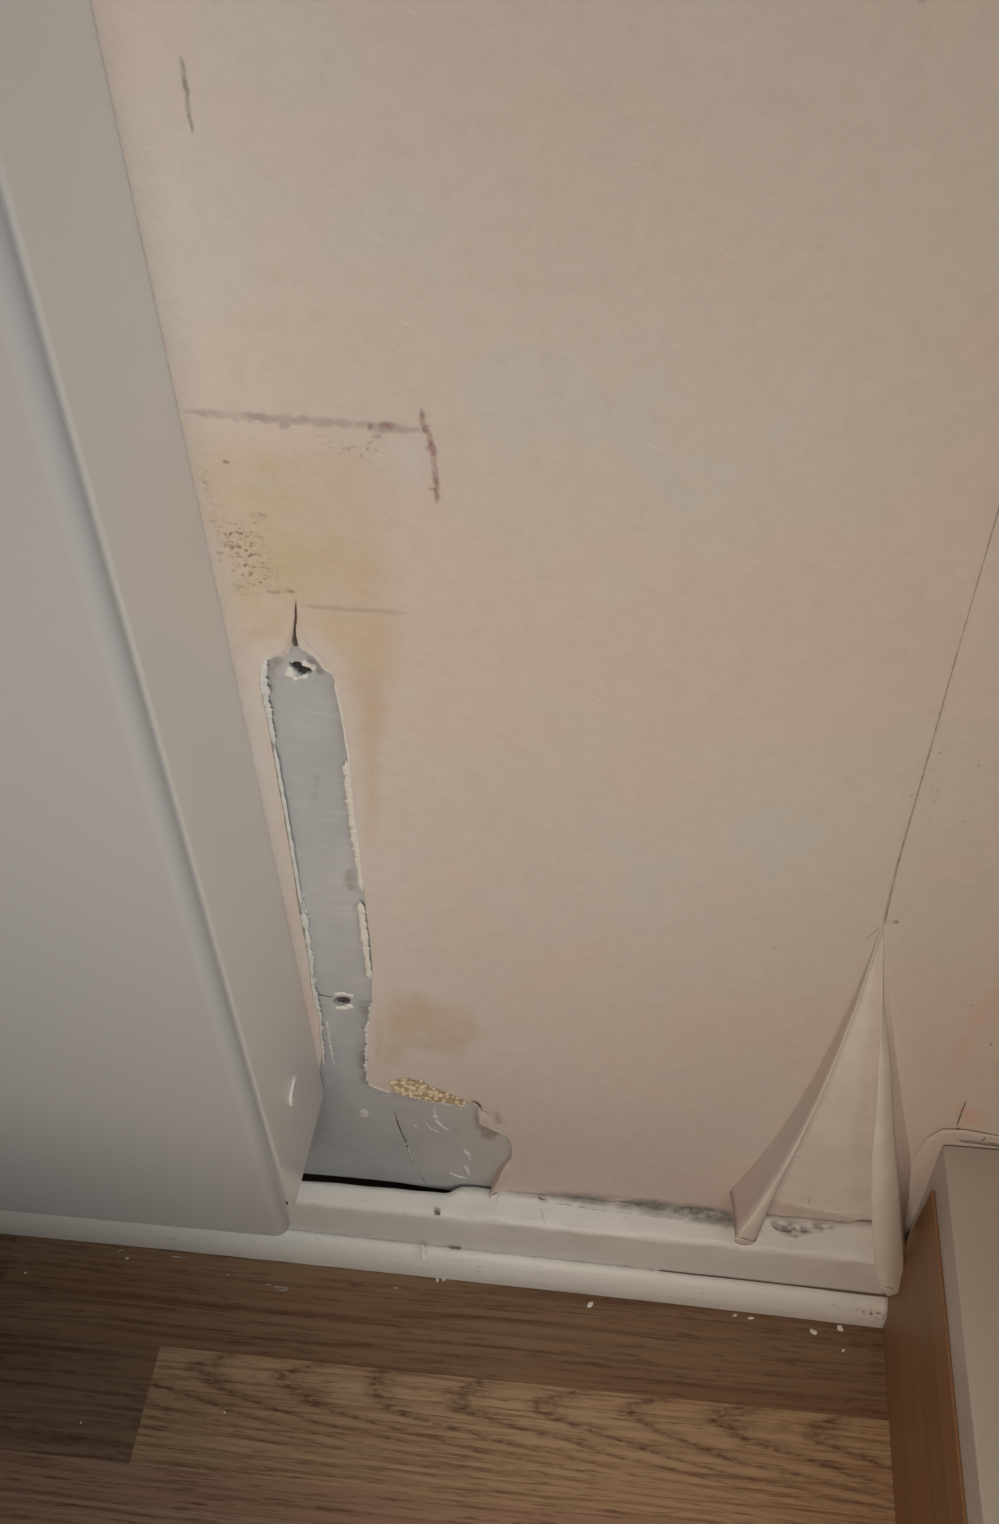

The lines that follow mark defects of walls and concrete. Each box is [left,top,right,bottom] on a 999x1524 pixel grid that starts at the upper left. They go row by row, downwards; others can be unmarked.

damp [177,409,459,929]
peeling [259,645,524,1198]
crack [885,658,956,921]